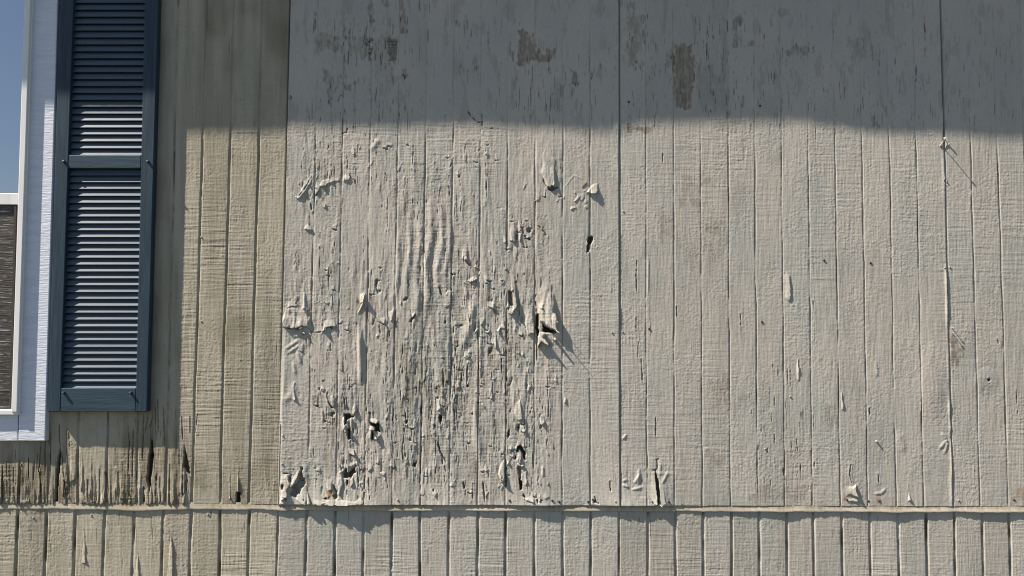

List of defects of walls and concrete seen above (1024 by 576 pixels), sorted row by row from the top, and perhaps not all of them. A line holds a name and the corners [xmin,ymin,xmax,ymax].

peeling [506,26,558,71]
peeling [664,41,735,119]
peeling [295,158,350,209]
peeling [523,170,599,210]
crack [289,6,929,505]
peeling [290,212,546,501]
crack [6,424,70,502]
crack [128,399,198,494]
peeling [523,479,550,503]